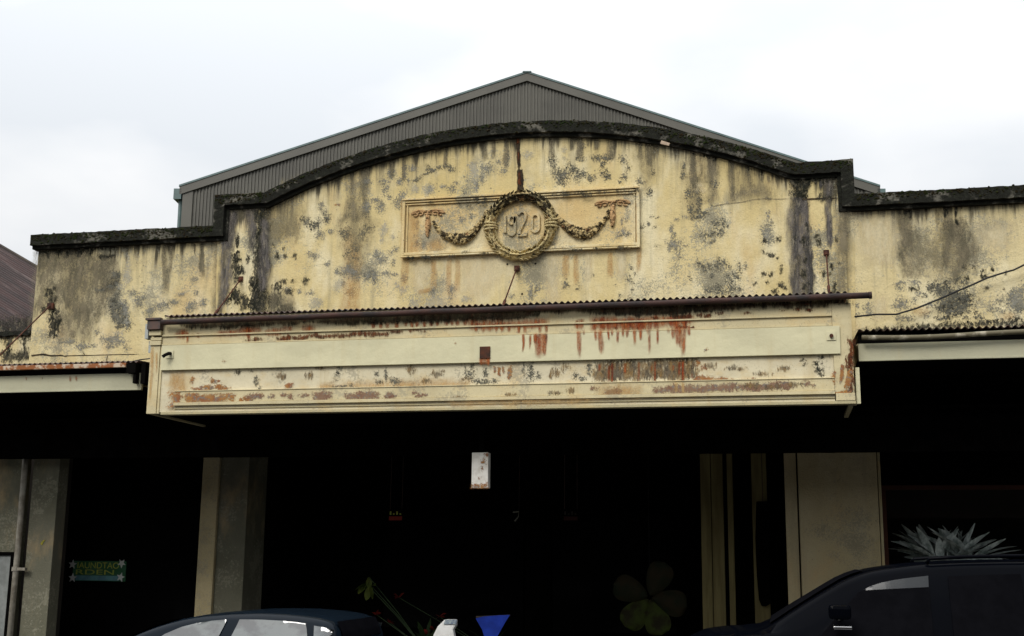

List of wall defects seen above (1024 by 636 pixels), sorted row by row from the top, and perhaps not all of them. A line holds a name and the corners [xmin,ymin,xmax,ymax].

water stain [570,139,614,157]
water stain [193,195,310,313]
water stain [753,177,850,295]
water stain [896,207,1007,301]
water stain [0,247,117,363]
rust [166,376,397,409]
peeling [374,365,445,386]
peeling [461,363,497,385]
peeling [521,358,802,395]
rust [576,311,816,395]
rust [832,338,856,393]